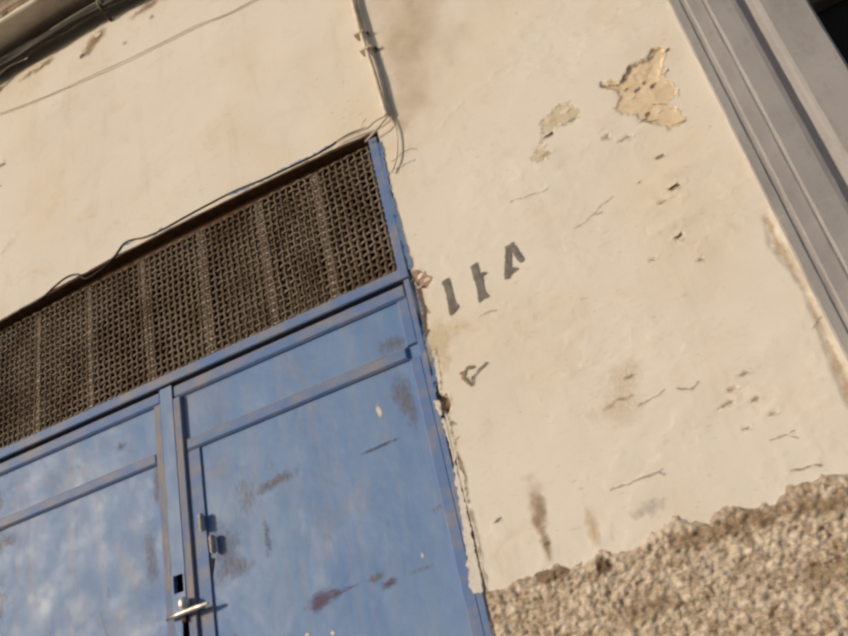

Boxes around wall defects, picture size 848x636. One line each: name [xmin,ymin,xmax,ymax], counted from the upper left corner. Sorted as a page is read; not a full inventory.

flaking render [600,47,686,130]
peeling [530,101,580,162]
flaking render [412,269,433,289]
damp [533,498,545,526]
flaking render [534,566,569,584]
flaking render [594,557,611,576]